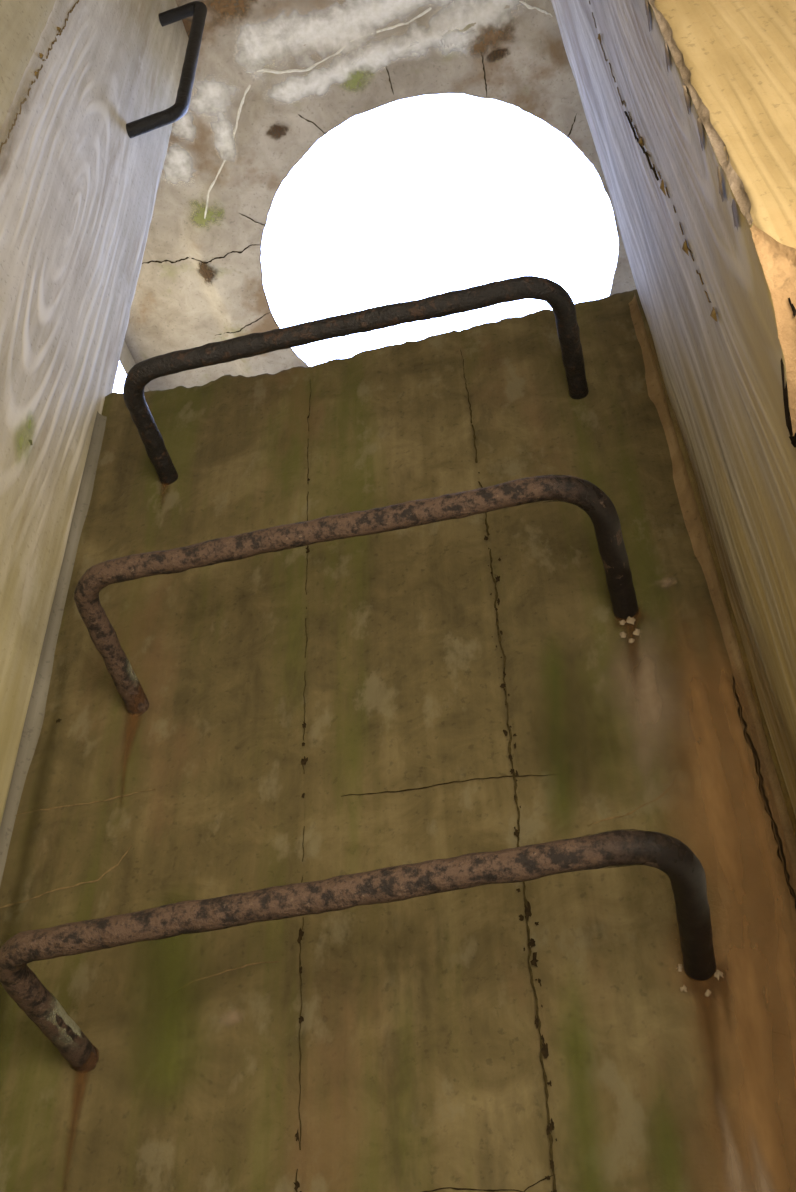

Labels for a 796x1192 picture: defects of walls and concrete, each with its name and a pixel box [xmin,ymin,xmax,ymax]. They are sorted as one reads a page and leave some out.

crack [142,213,271,264]
spalling [645,0,796,448]
crack [344,349,557,847]
rust [68,1043,99,1159]
crack [423,881,557,1192]
rust [682,646,796,1192]